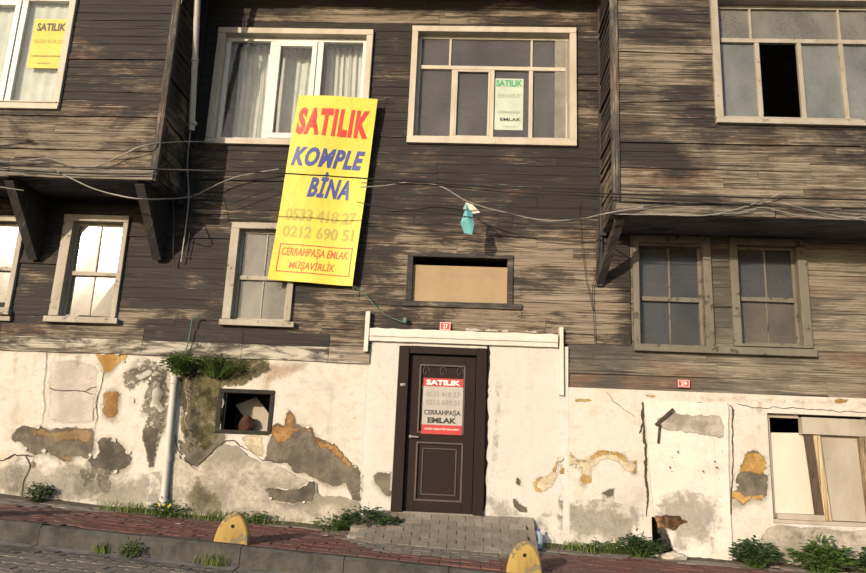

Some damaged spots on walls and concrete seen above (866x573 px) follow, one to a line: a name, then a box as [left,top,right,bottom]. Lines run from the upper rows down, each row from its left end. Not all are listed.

crack [41,352,104,428]
peeling [95,353,170,467]
damp [172,356,270,452]
crack [0,454,33,495]
flaking render [12,425,132,493]
flaking render [242,409,392,505]
peeling [512,450,637,513]
crack [607,393,649,517]
peeling [730,449,770,505]
spalling [652,515,688,553]